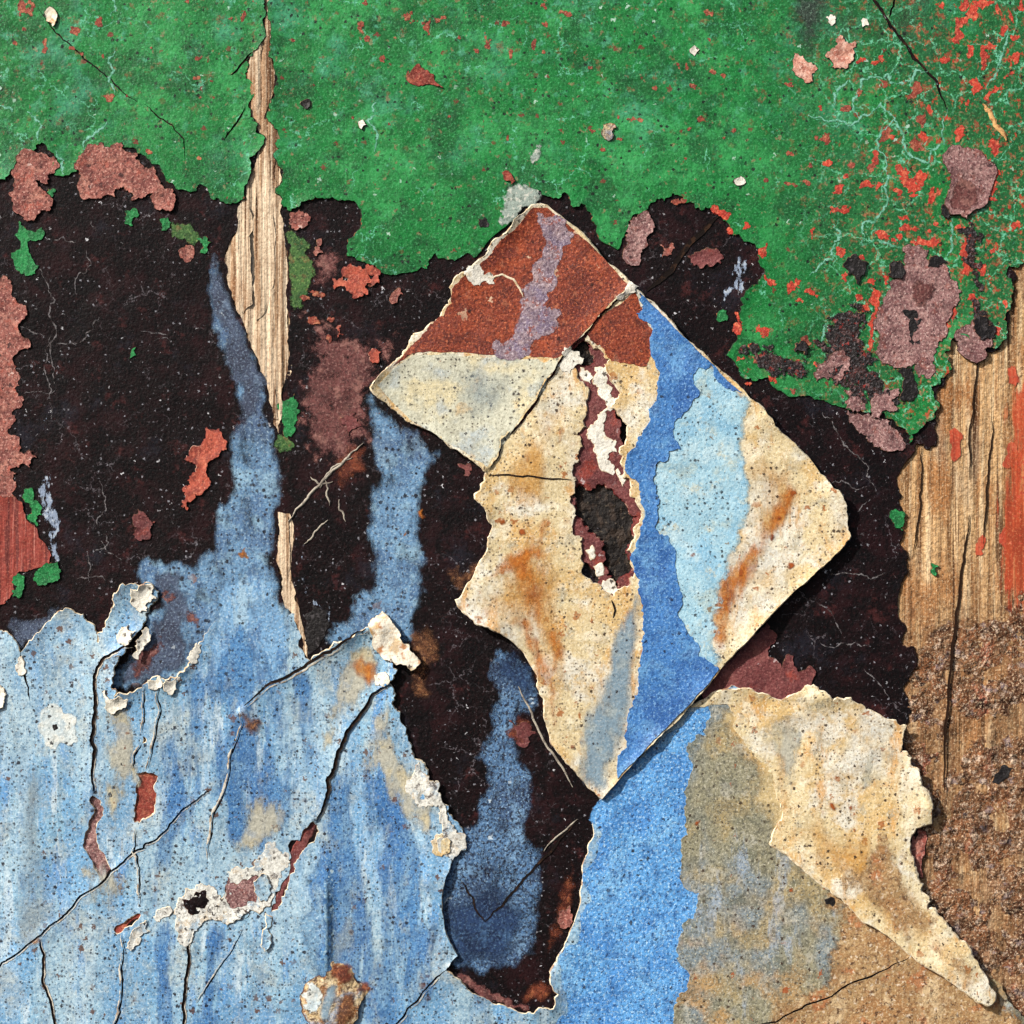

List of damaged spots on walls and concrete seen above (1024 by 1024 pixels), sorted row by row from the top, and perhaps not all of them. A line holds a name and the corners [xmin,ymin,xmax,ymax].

peeling [13,0,58,53]
peeling [784,159,833,188]
crack [808,0,948,273]
peeling [11,221,45,276]
crack [490,299,617,467]
peeling [22,487,42,526]
peeling [12,561,62,599]
peeling [102,203,997,1010]
crack [943,363,994,791]
crack [317,686,388,819]
crack [0,629,366,1024]
crack [463,819,578,922]